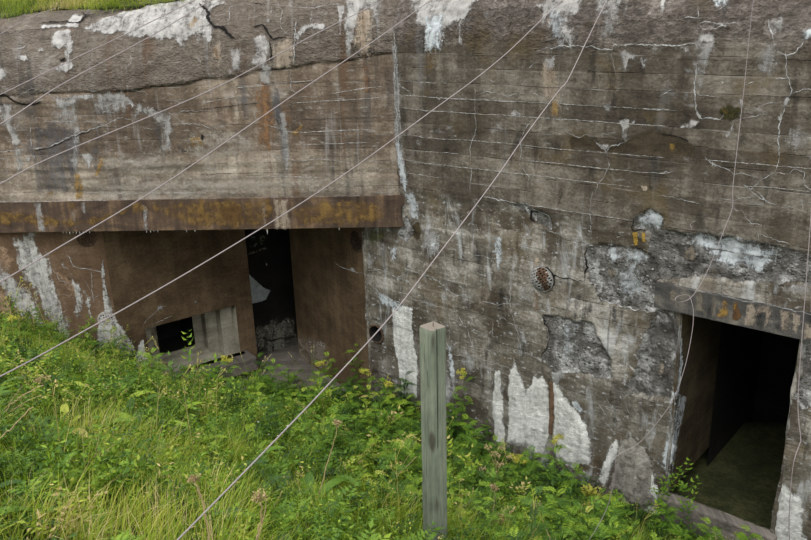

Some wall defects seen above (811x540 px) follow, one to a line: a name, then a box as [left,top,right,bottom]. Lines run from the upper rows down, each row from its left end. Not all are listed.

crack [0,1,172,34]
leakage [38,0,225,63]
crack [0,85,149,174]
corrosion [256,81,302,167]
crack [126,1,811,281]
crack [3,192,105,202]
corrosion [296,202,381,224]
leakage [0,204,69,338]
leakage [71,274,92,317]
leakage [86,266,149,367]
leakage [492,363,591,468]